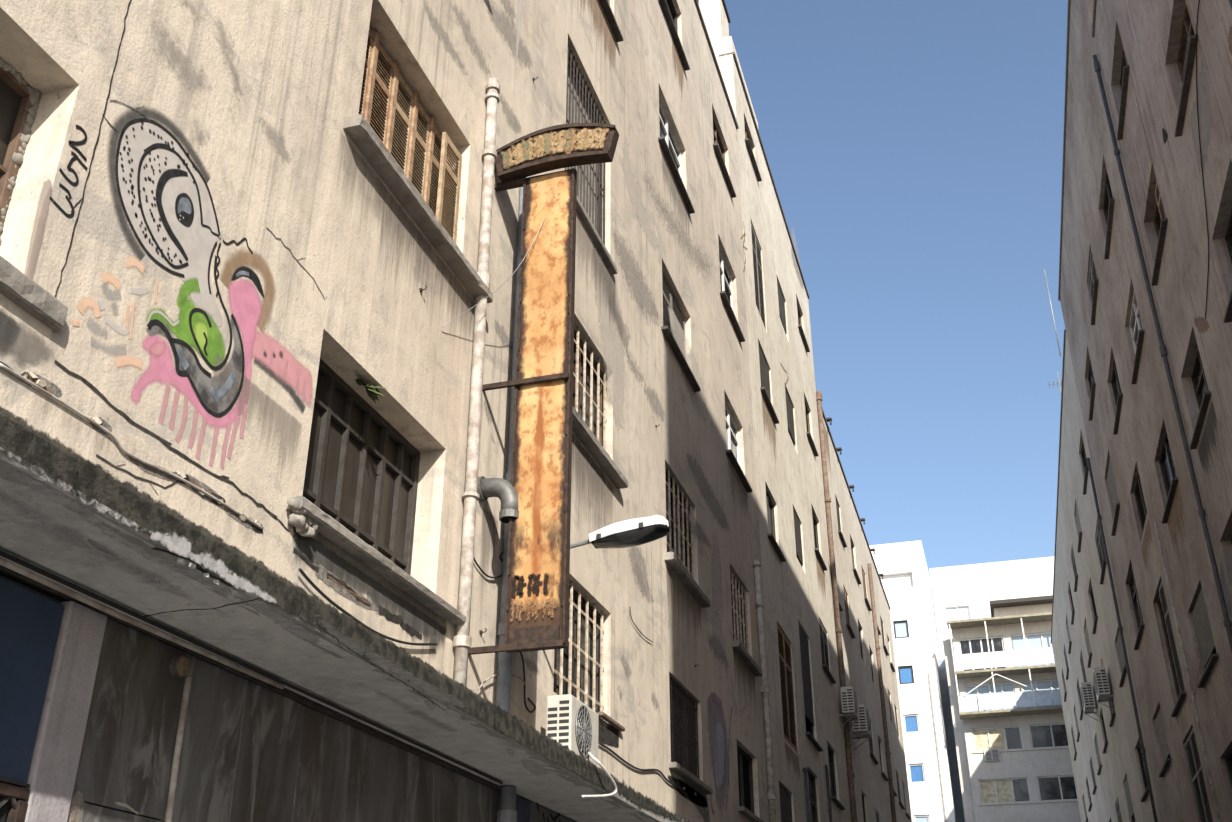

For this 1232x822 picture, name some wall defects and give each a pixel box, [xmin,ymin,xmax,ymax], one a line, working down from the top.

crack [266,227,325,299]
water stain [218,360,297,439]
spalling [126,455,263,533]
water stain [151,532,275,603]
peeling [88,532,465,707]
water stain [295,529,446,650]